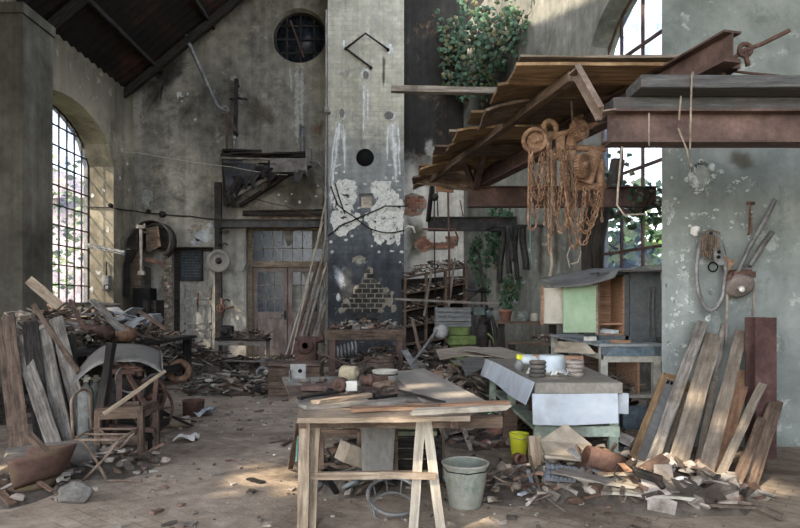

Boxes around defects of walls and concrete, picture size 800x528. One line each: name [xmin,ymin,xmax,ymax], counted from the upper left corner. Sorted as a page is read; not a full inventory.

water stain [330,109,346,201]
water stain [384,111,400,179]
spalling [665,149,724,195]
peeling [329,164,427,263]
spalling [414,236,457,252]
spalling [338,267,397,322]